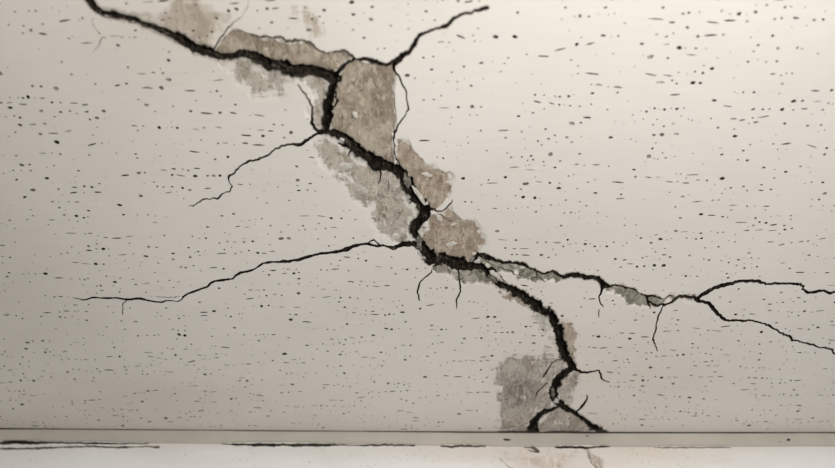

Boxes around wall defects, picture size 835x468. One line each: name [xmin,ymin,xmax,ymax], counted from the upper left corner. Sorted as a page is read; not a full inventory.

crack [75,0,489,315]
spalling [214,28,563,313]
spalling [486,318,599,441]
crack [416,240,835,432]
spalling [604,282,697,310]